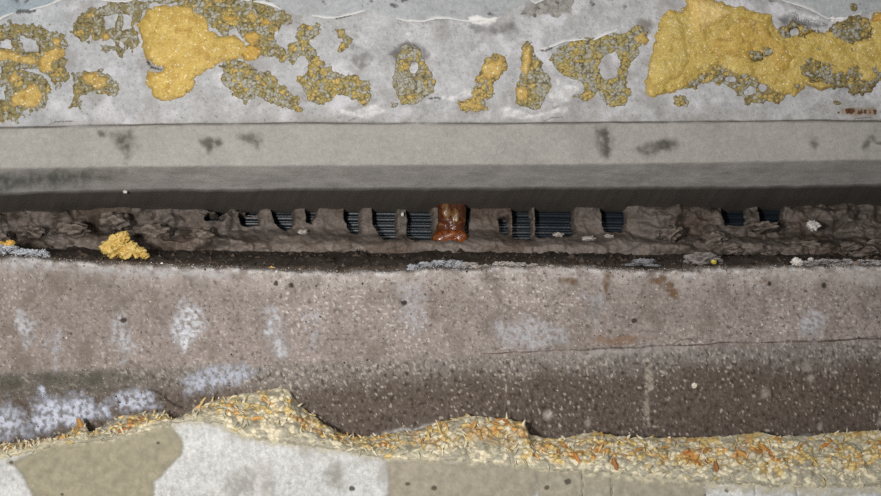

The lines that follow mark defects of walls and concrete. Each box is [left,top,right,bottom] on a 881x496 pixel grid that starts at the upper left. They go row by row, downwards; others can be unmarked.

peeling [0,0,508,124]
peeling [500,25,649,119]
peeling [673,66,785,107]
peeling [748,46,773,62]
peeling [778,0,881,105]
water stain [0,385,155,439]
spalling [0,388,881,495]